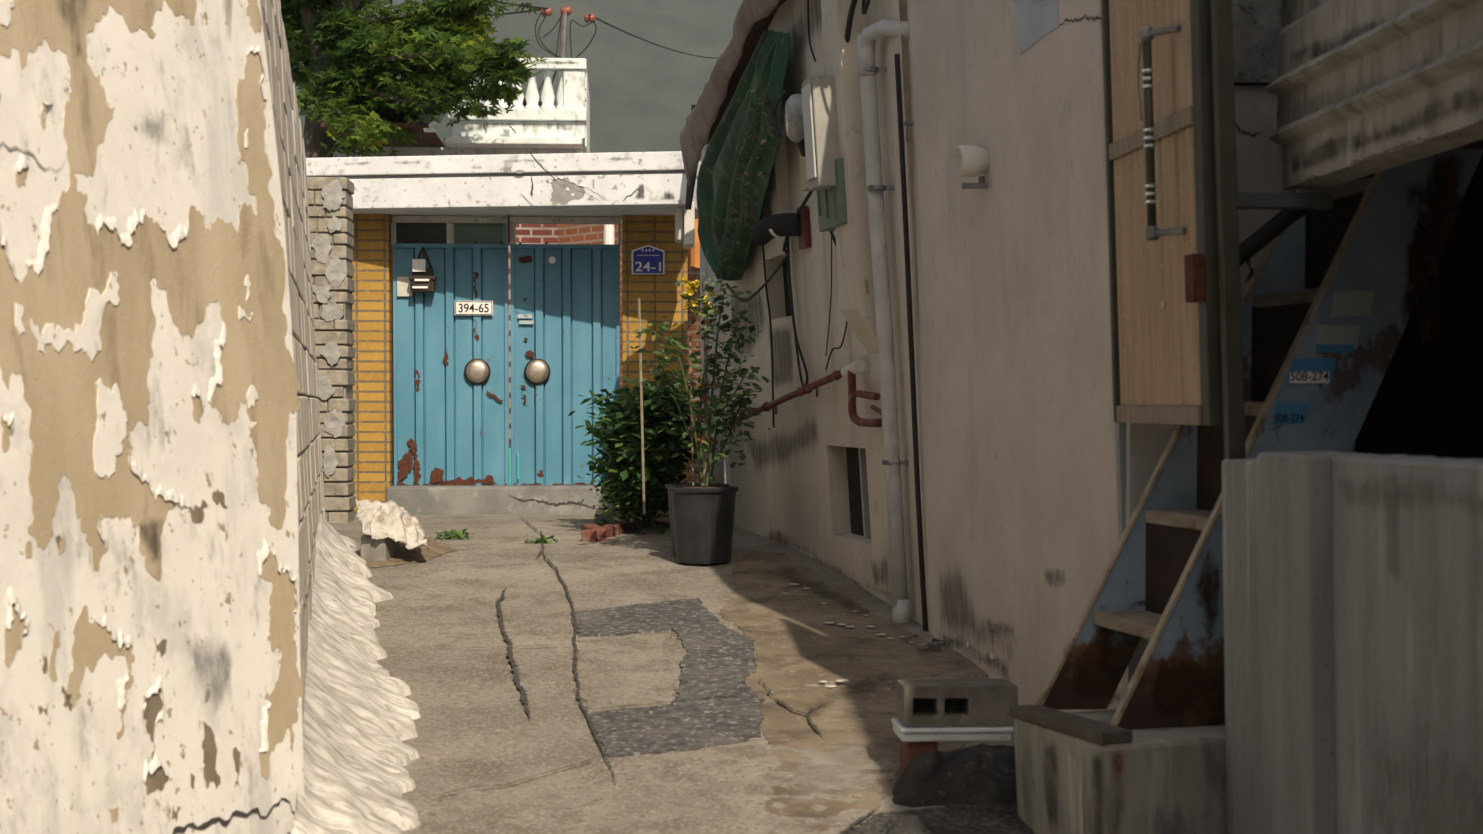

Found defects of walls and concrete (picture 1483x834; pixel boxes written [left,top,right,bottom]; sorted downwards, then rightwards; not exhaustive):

crack [0,141,65,171]
rust [1403,155,1462,356]
peeling [0,0,304,795]
rust [397,438,603,486]
peeling [108,806,119,822]
crack [172,798,295,834]
leakage [1045,747,1122,834]